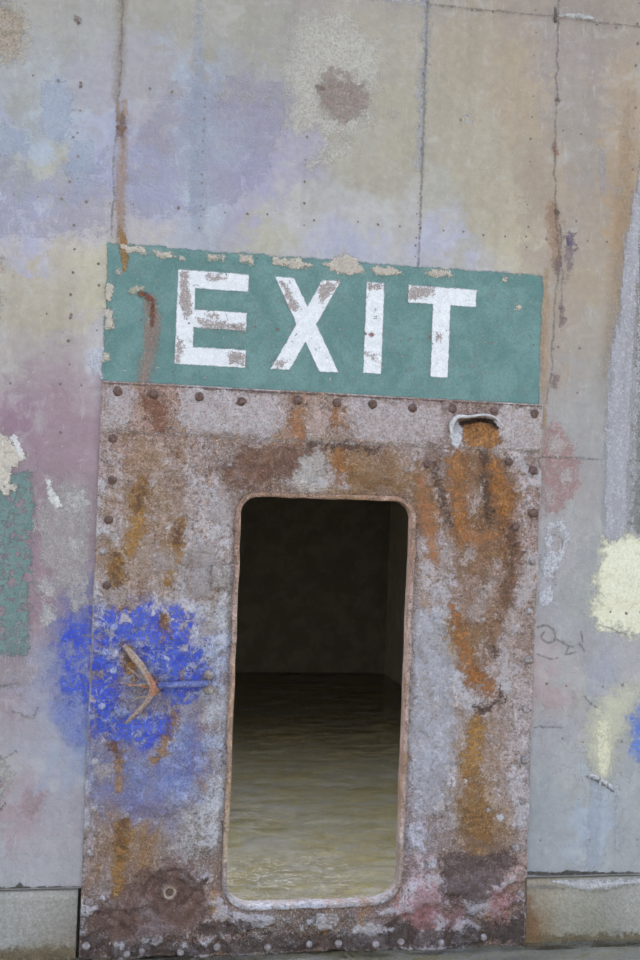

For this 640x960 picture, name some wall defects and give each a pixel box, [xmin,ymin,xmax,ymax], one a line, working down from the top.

spalling [282,11,382,171]
corrosion [116,100,129,271]
peeling [103,268,121,330]
corrosion [128,284,173,434]
peeling [120,244,247,332]
peeling [272,253,402,304]
water stain [601,164,640,542]
peeling [0,422,29,496]
corrosion [222,395,405,491]
corrosion [104,475,152,612]
corrosion [416,445,529,909]
corrosion [80,814,524,959]